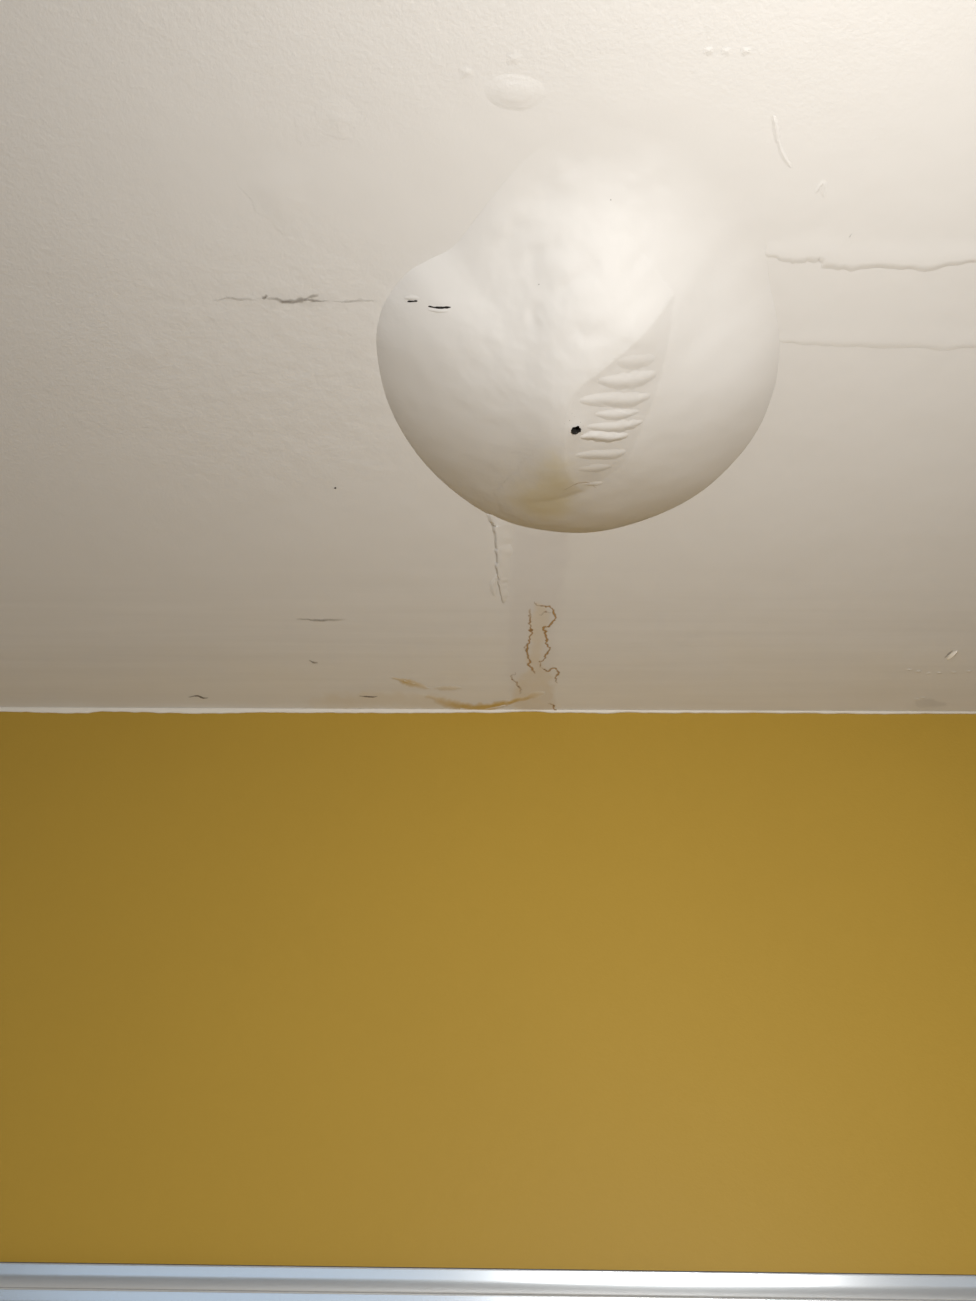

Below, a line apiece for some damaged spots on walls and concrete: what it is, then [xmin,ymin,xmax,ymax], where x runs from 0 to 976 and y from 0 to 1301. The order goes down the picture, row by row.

crack [250,291,344,313]
damp [500,524,577,710]